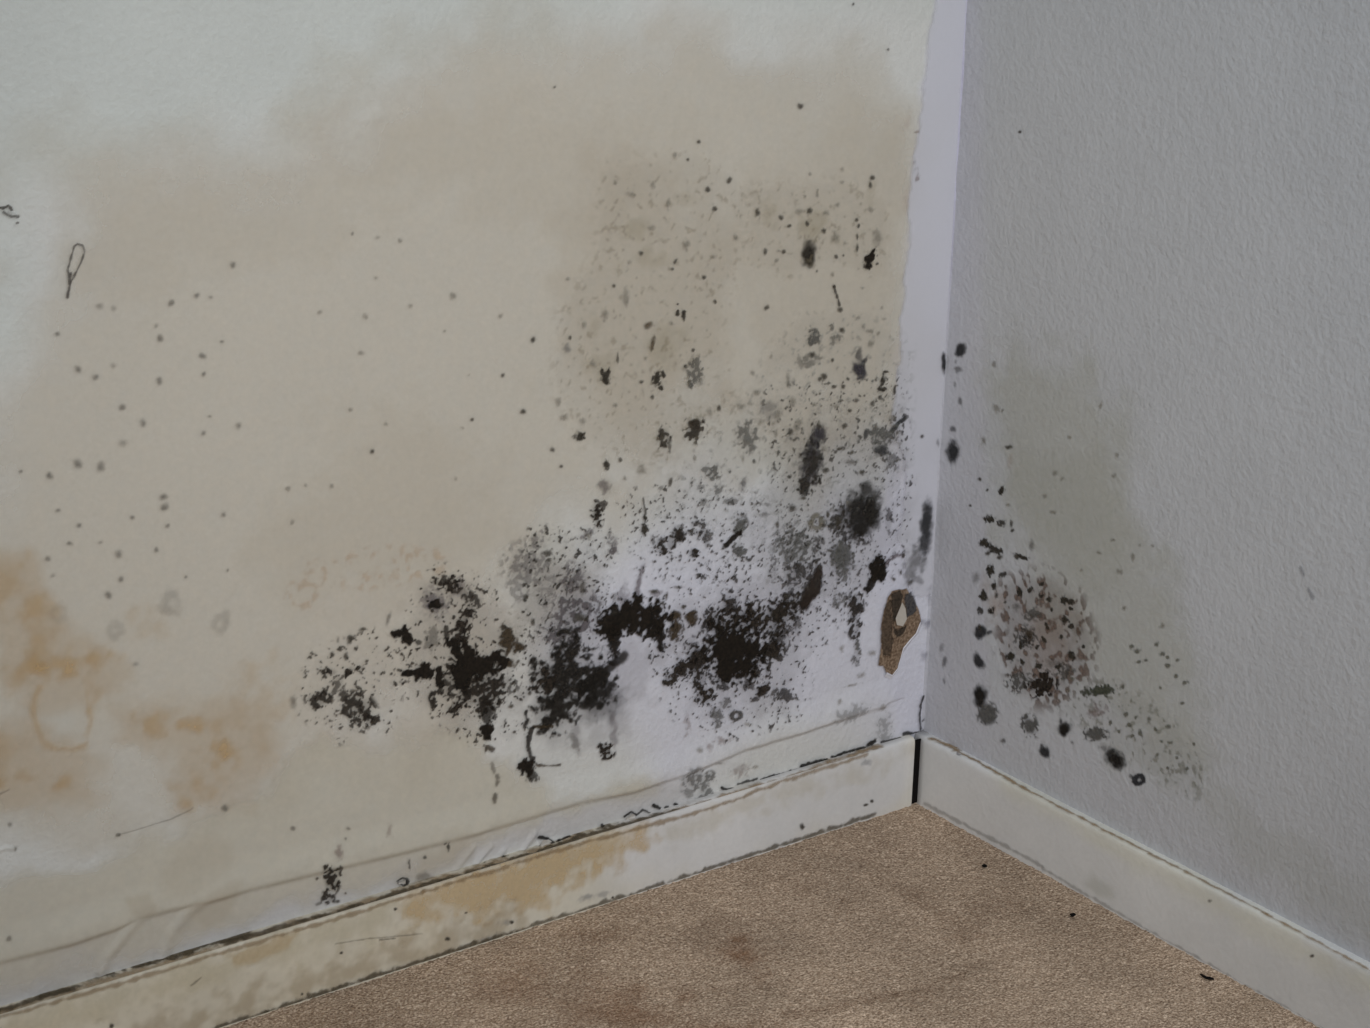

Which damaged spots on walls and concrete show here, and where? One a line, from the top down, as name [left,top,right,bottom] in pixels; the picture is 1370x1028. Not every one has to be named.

leakage [764,194,879,357]
leakage [592,355,619,385]
leakage [640,371,666,399]
leakage [684,349,704,389]
leakage [819,317,896,428]
leakage [942,344,966,371]
leakage [657,406,745,494]
leakage [946,441,959,462]
mould [974,515,1189,786]
leakage [0,416,932,979]
peeling [0,589,922,978]